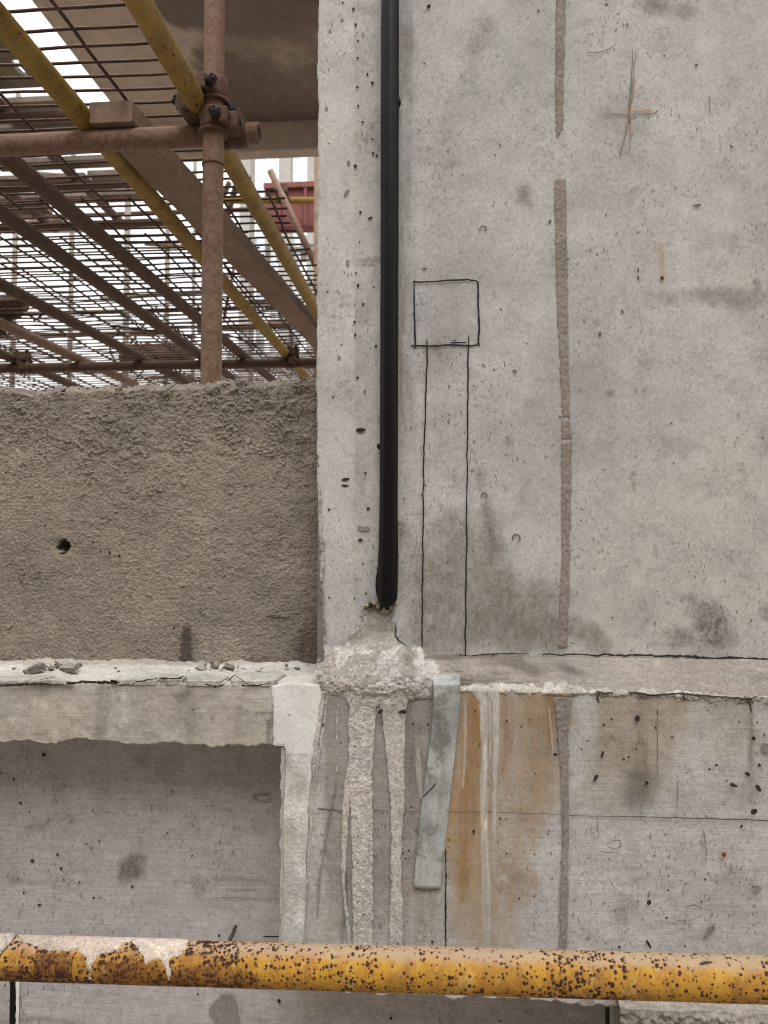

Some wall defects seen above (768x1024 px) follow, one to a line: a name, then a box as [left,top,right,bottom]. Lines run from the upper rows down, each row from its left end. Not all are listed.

spalling [0,675,75,685]
peeling [110,455,434,943]
leakage [330,759,351,944]
corrosion [447,697,496,899]
crack [451,691,768,821]
crack [459,652,768,660]